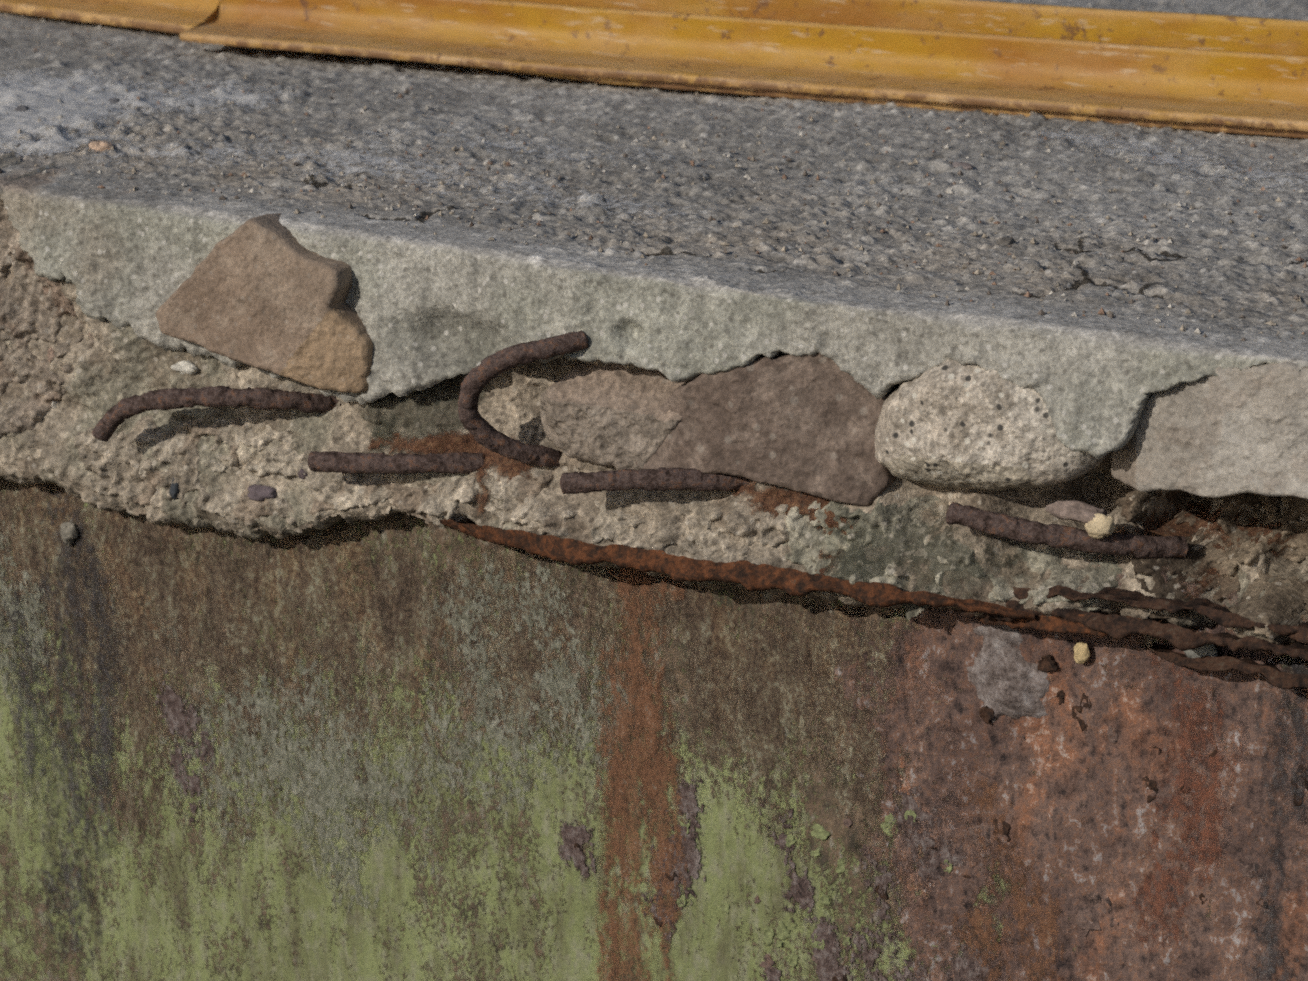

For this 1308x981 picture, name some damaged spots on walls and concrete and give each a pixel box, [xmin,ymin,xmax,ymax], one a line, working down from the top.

spalling [0,206,95,439]
spalling [74,415,578,537]
rust [368,431,533,516]
spalling [590,484,1308,644]
leakage [0,494,120,955]
peeling [155,670,216,824]
leakage [160,558,637,913]
rust [0,477,1308,981]
peeling [557,819,596,879]